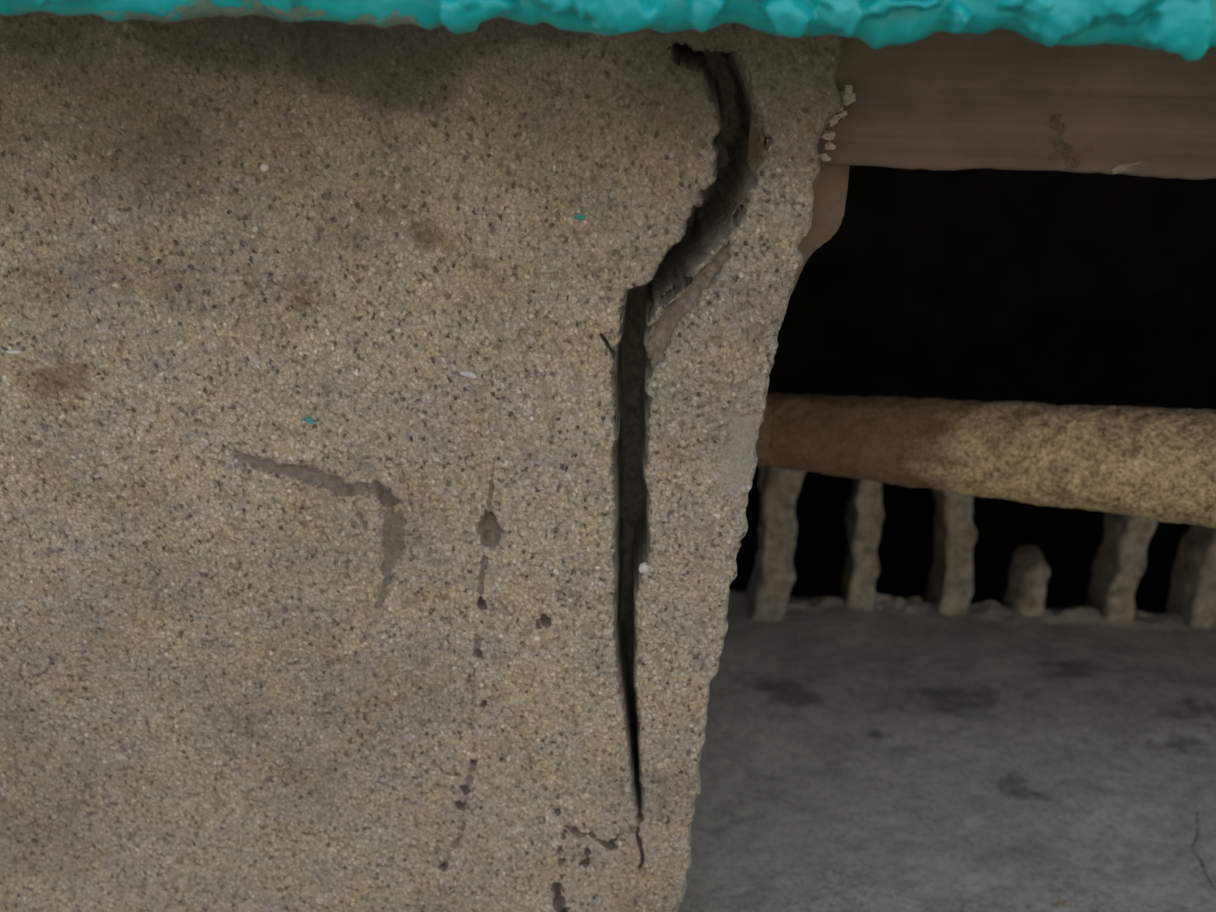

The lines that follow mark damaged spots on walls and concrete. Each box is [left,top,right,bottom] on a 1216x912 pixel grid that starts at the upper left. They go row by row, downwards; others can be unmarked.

crack [550,43,771,912]